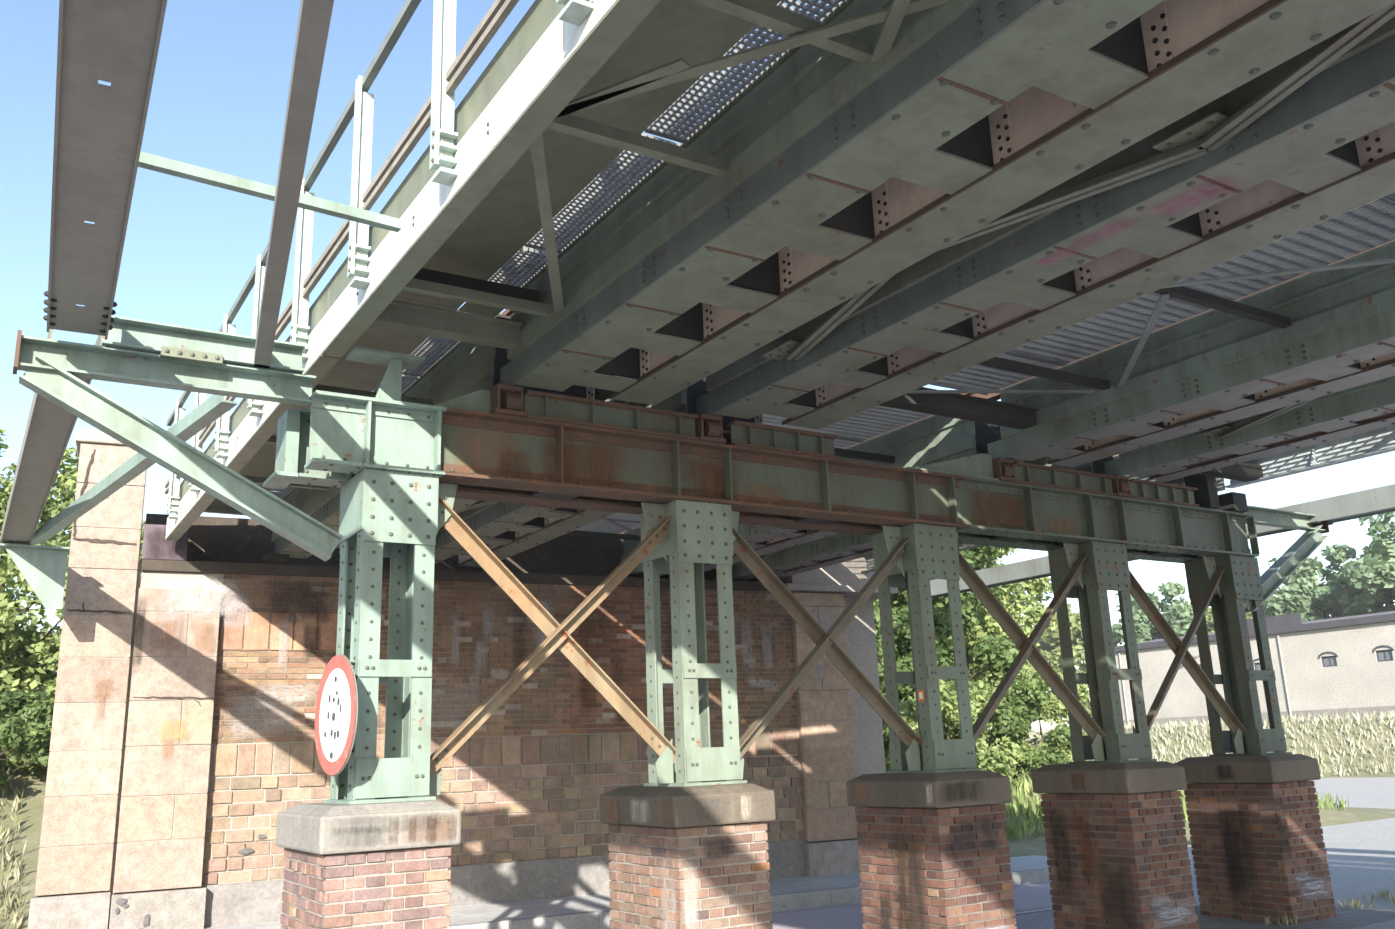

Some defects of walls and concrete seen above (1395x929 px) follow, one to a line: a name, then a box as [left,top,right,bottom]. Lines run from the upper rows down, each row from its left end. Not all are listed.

damp [881,850,924,929]